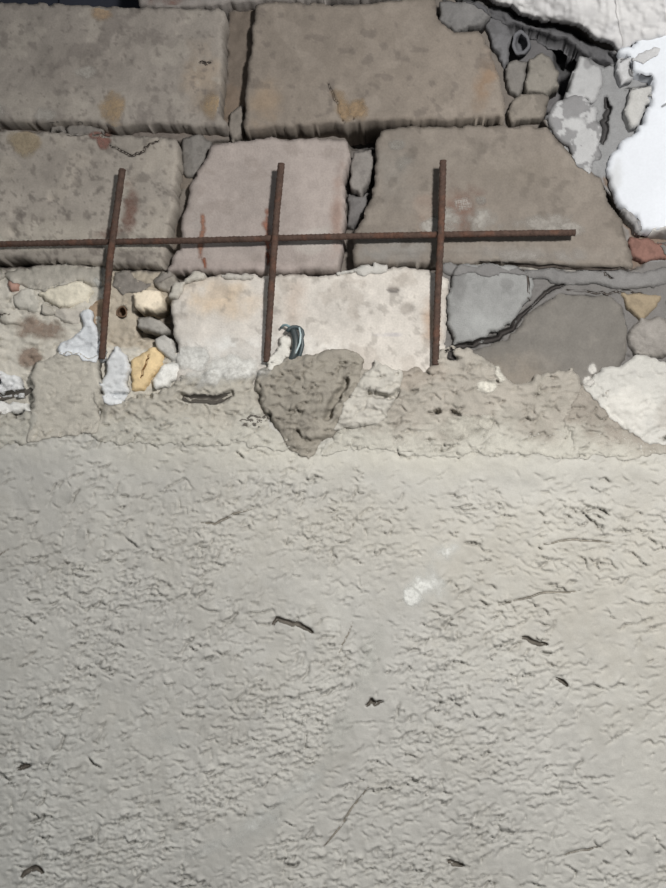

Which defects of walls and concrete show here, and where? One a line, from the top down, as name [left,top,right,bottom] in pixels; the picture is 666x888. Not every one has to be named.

flaking render [614,47,660,132]
crack [101,131,160,157]
corrosion [198,215,206,268]
corrosion [263,210,271,265]
spalling [0,159,576,365]
flaking render [619,208,643,238]